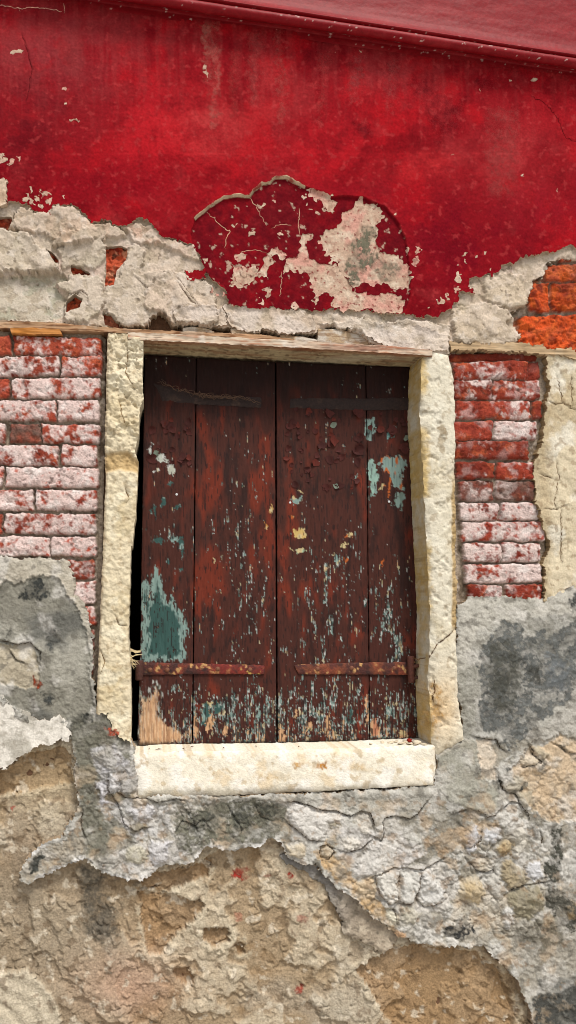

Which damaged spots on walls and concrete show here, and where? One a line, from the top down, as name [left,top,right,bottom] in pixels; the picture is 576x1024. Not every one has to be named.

peeling [0,178,12,230]
peeling [22,186,65,208]
spalling [105,247,128,286]
spalling [173,175,576,603]
spalling [0,315,123,697]
damp [18,578,50,600]
crack [414,631,453,702]
damp [476,619,576,751]
crack [292,801,424,860]
crack [459,777,543,872]
spalling [0,739,528,1024]
crack [373,862,442,918]